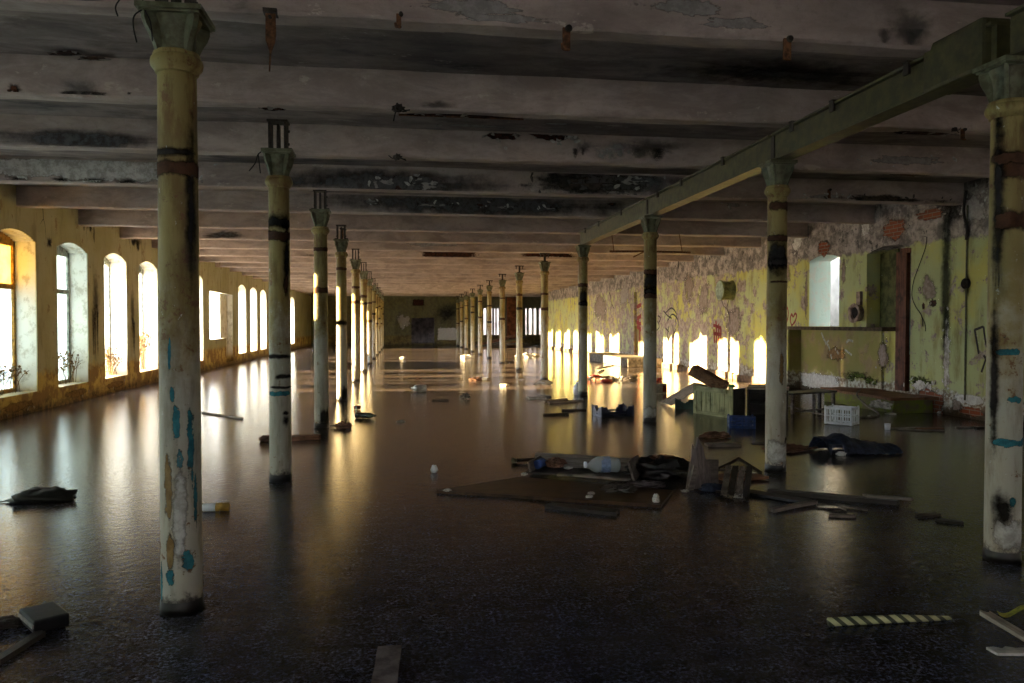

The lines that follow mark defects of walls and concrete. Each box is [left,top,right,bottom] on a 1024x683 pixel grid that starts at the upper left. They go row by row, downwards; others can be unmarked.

peeling [841,182,989,241]
flaking render [816,240,830,257]
damp [941,217,951,360]
damp [989,310,999,445]
peeling [164,387,198,526]
damp [992,494,1012,525]
peeling [161,534,194,601]